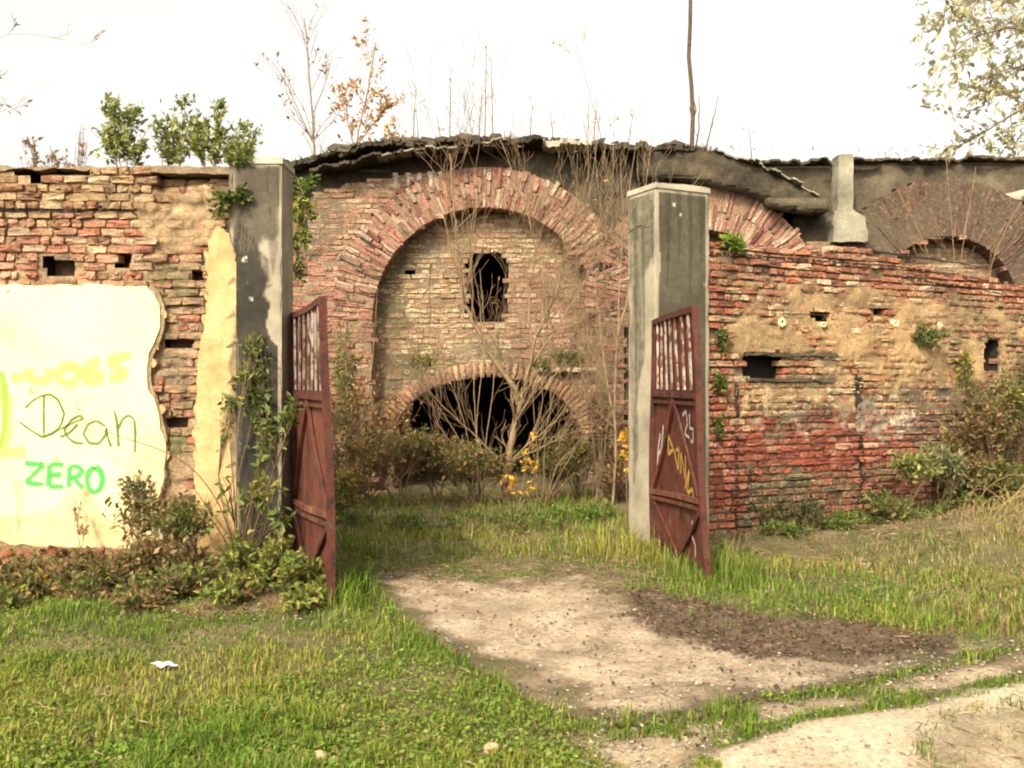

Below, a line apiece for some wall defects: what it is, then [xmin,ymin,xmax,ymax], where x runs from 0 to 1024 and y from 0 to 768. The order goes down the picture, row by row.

spalling [30,170,44,184]
spalling [45,256,55,276]
spalling [742,352,782,379]
spalling [984,340,997,371]
flaking render [147,225,247,565]
damp [225,227,278,566]